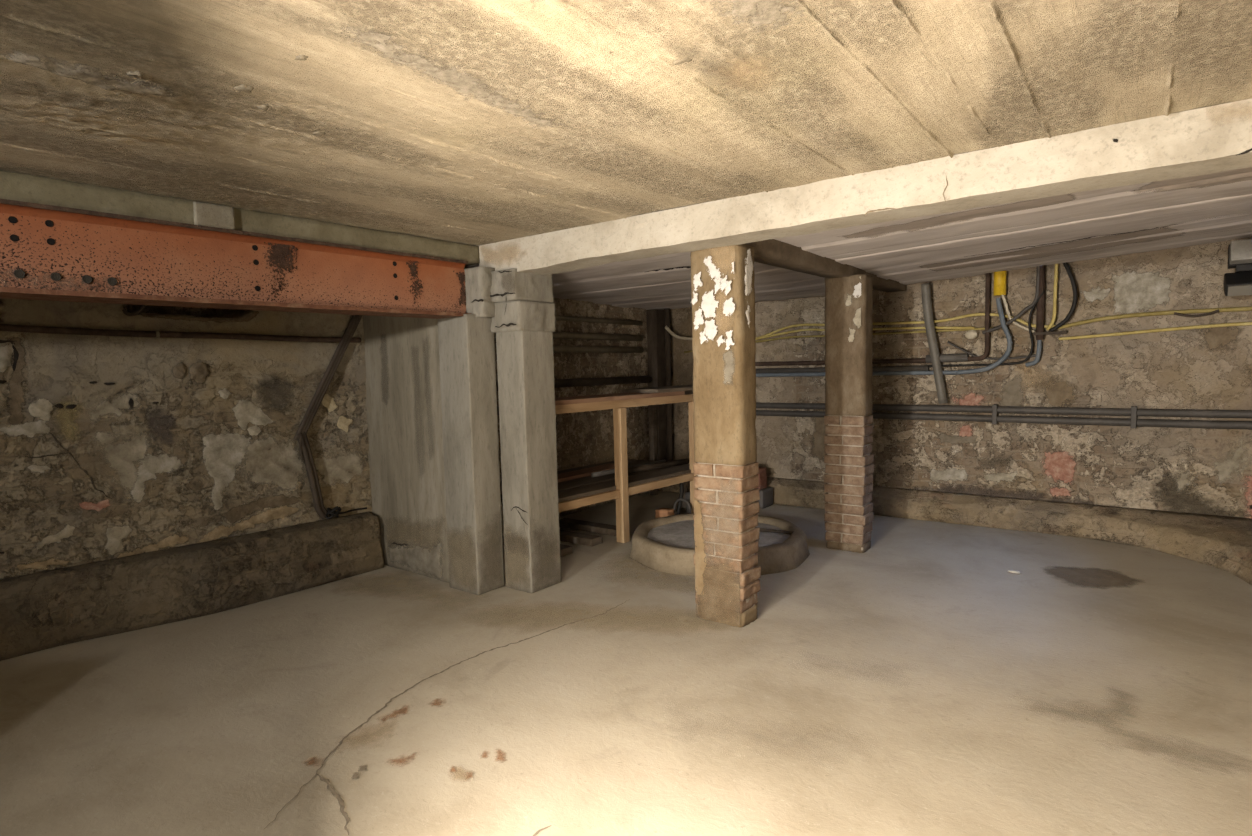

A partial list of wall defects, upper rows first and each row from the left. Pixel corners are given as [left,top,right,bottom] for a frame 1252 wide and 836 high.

corrosion [262,242,298,301]
corrosion [406,261,424,307]
peeling [691,249,754,350]
peeling [845,276,861,342]
flaking render [0,343,14,384]
flaking render [0,420,50,438]
flaking render [218,388,275,436]
flaking render [321,394,353,433]
flaking render [1041,451,1077,497]
flaking render [105,525,132,557]
leakage [1046,567,1137,588]
crack [264,599,630,835]